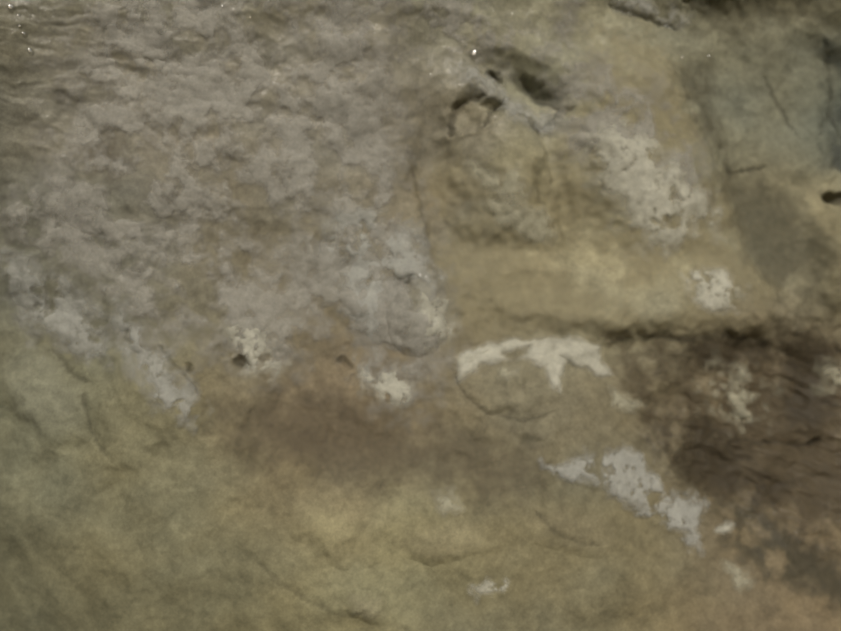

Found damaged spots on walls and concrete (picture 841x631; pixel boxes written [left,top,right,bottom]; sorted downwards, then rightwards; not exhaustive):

leakage [570,71,718,246]
leakage [693,270,732,311]
leakage [458,338,610,390]
leakage [729,389,754,418]
leakage [550,460,593,481]
leakage [603,449,702,544]